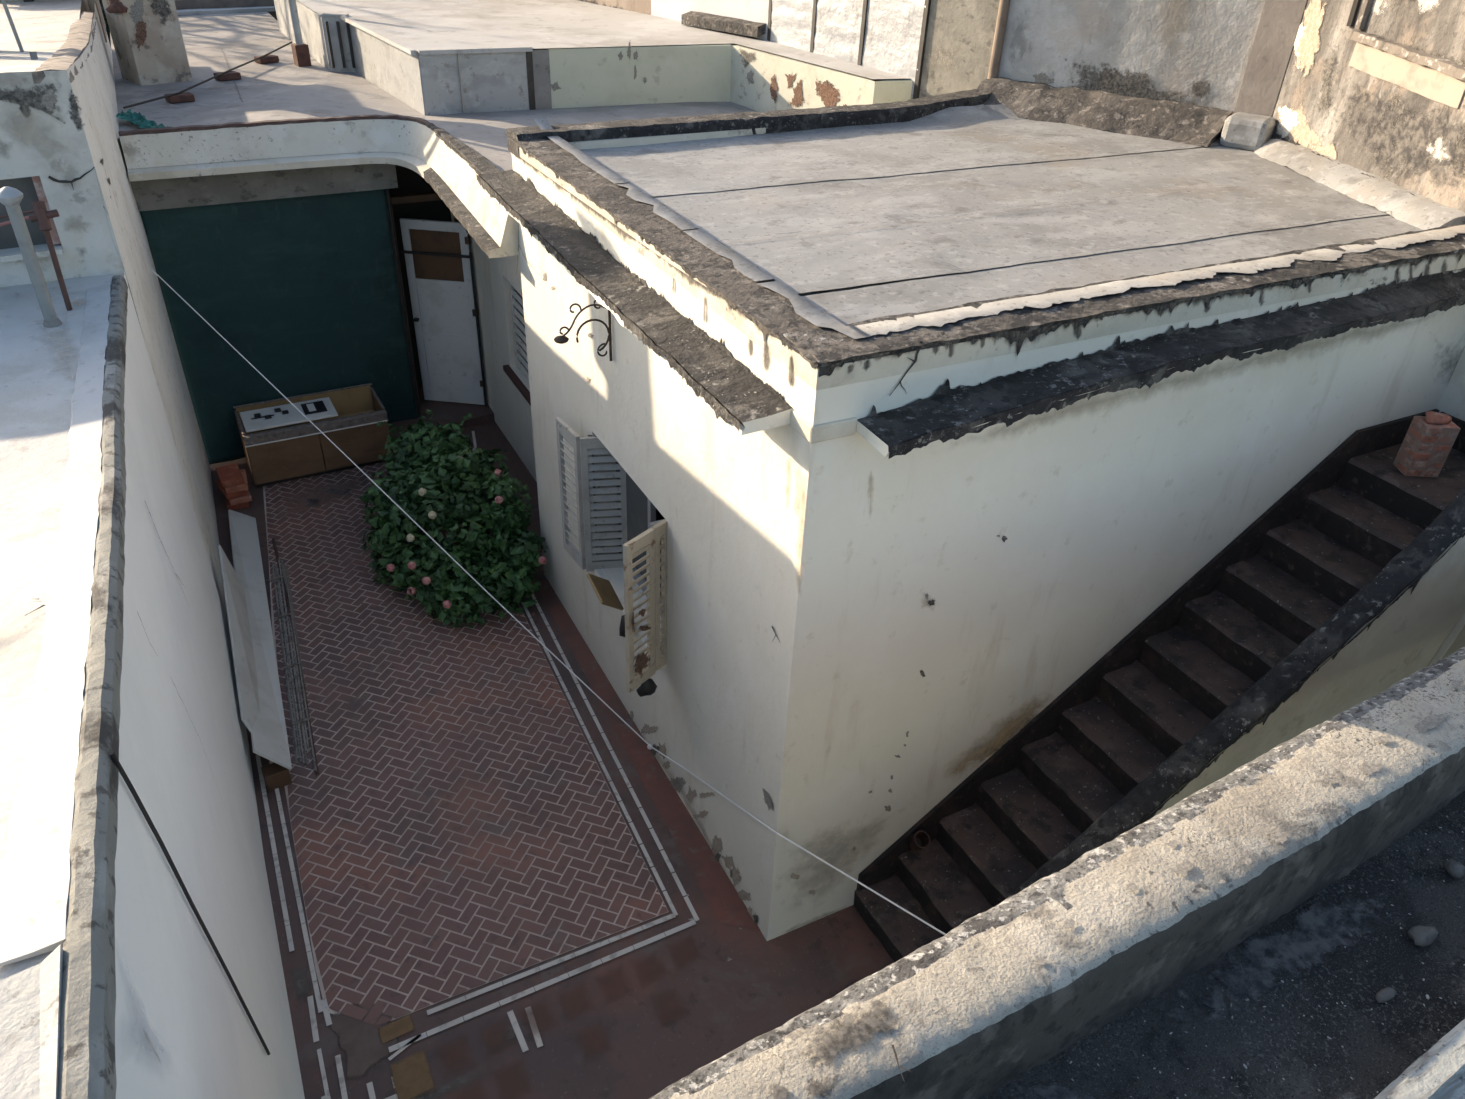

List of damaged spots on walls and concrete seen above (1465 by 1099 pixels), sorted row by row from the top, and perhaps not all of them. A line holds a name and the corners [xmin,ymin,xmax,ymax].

peeling [1293,0,1327,77]
damp [1372,0,1439,15]
damp [0,84,82,130]
peeling [747,71,847,107]
peeling [1277,102,1337,160]
damp [1317,51,1465,186]
peeling [630,711,715,818]
damp [956,705,1038,771]
peeling [712,836,758,929]